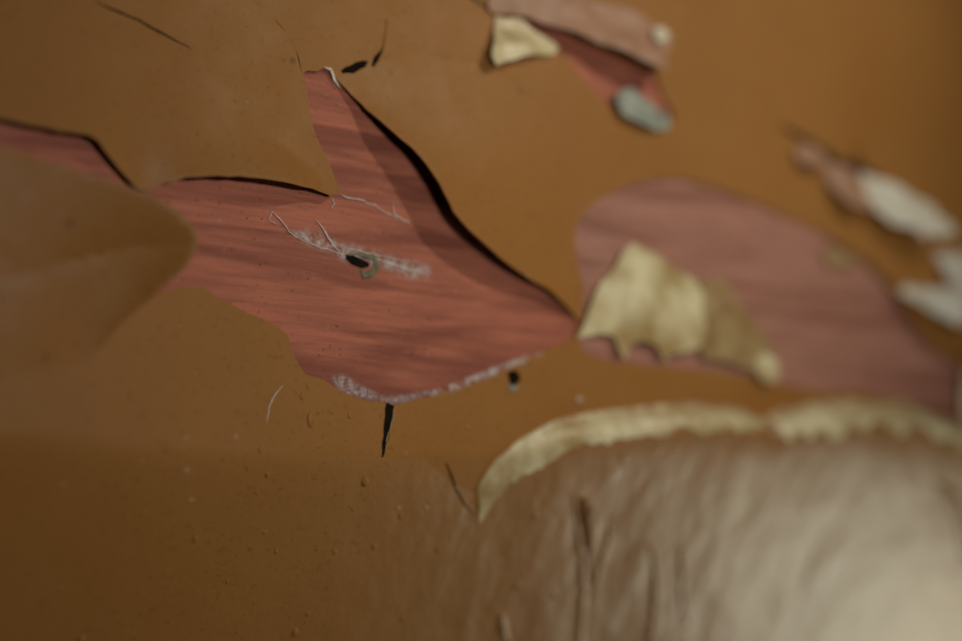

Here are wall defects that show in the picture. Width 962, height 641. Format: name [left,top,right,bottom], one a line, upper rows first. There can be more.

peeling [0,0,962,458]